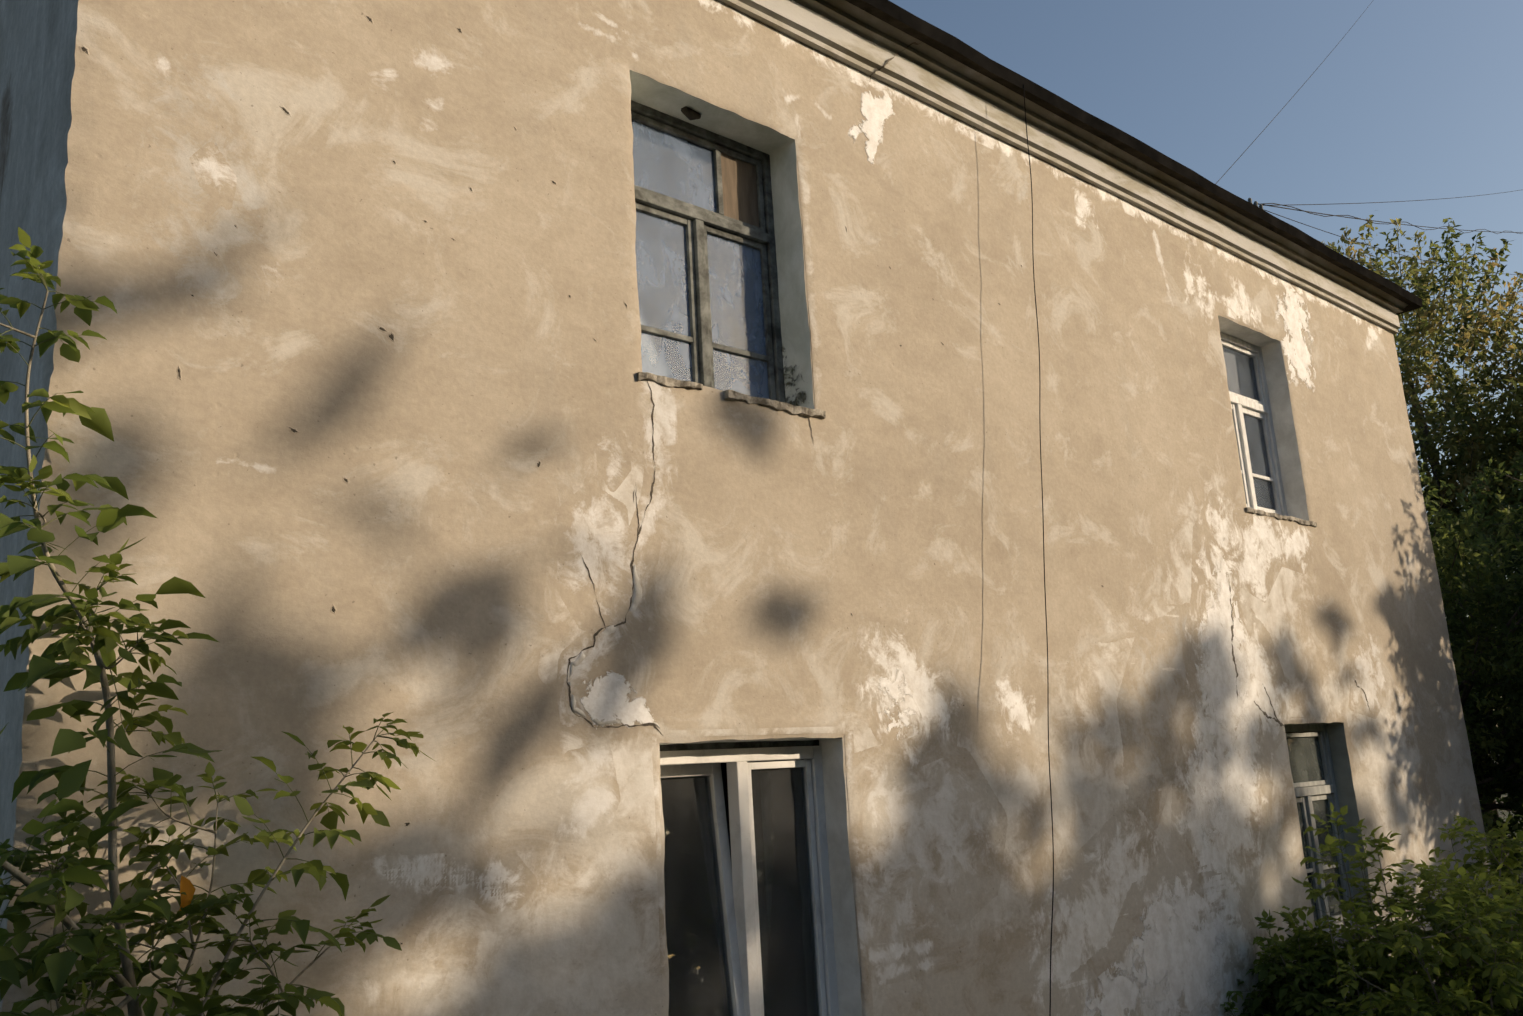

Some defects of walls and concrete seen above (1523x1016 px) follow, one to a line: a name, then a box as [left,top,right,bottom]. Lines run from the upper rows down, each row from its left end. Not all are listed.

peeling [681,0,1386,392]
peeling [555,670,669,845]
crack [555,367,678,735]
crack [1229,583,1284,727]
peeling [1018,803,1258,1016]